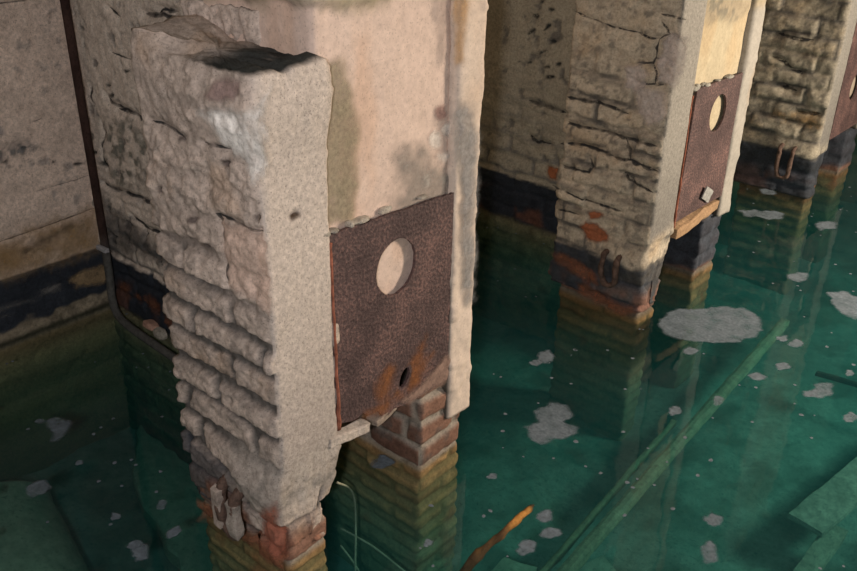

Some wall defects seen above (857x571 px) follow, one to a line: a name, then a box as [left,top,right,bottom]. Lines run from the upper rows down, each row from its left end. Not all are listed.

crack [575,11,686,86]
crack [529,96,658,215]
corrosion [674,96,694,228]
corrosion [329,242,341,431]
corrosion [403,357,451,401]
flaking render [241,508,287,570]